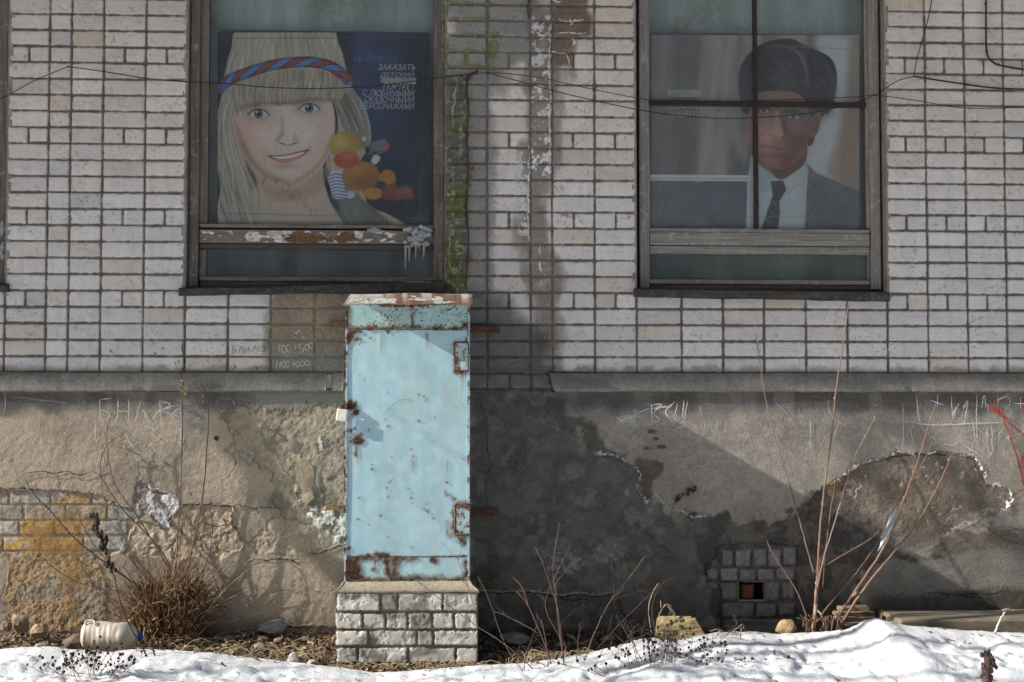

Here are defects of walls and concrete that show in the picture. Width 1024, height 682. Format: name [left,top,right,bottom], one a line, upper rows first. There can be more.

peeling [201,230,397,243]
leakage [447,0,1024,629]
flaking render [0,403,345,632]
crack [137,461,284,514]
spalling [818,451,1024,555]
crack [478,589,629,618]
hole [739,581,763,600]